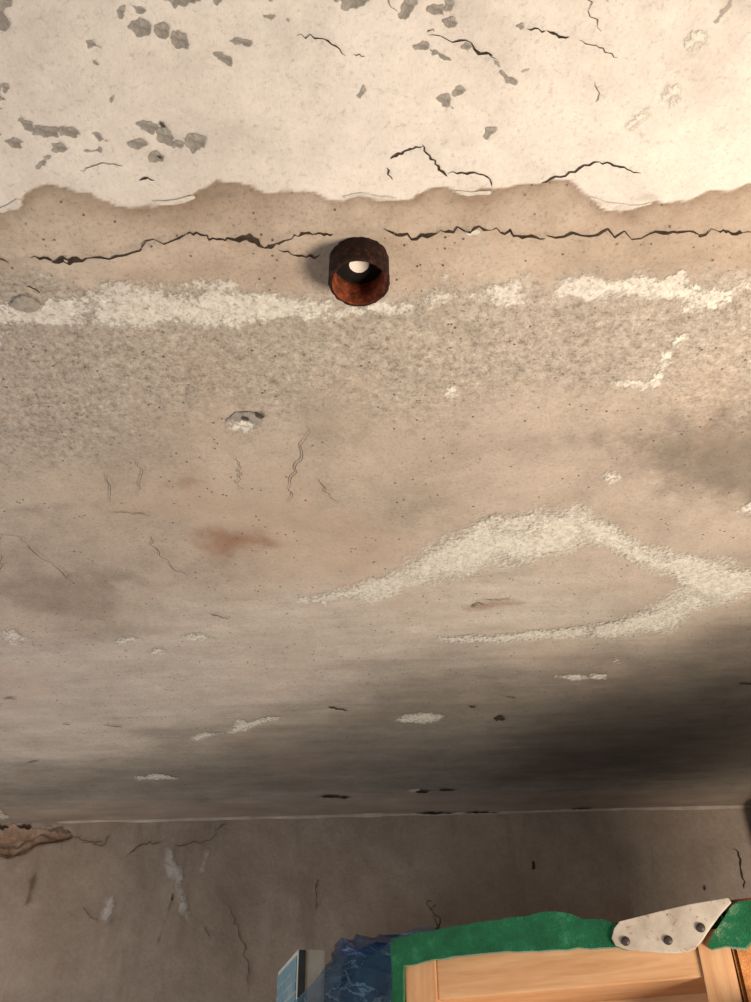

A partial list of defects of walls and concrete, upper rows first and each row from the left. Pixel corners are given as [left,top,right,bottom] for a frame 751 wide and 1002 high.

spalling [117,5,189,49]
spalling [399,0,457,28]
spalling [0,118,80,170]
spalling [128,120,207,163]
crack [387,145,492,185]
crack [543,162,637,183]
crack [31,232,333,265]
crack [385,226,751,241]
water stain [0,279,413,345]
water stain [554,270,751,319]
water stain [611,333,688,390]
water stain [295,504,751,644]